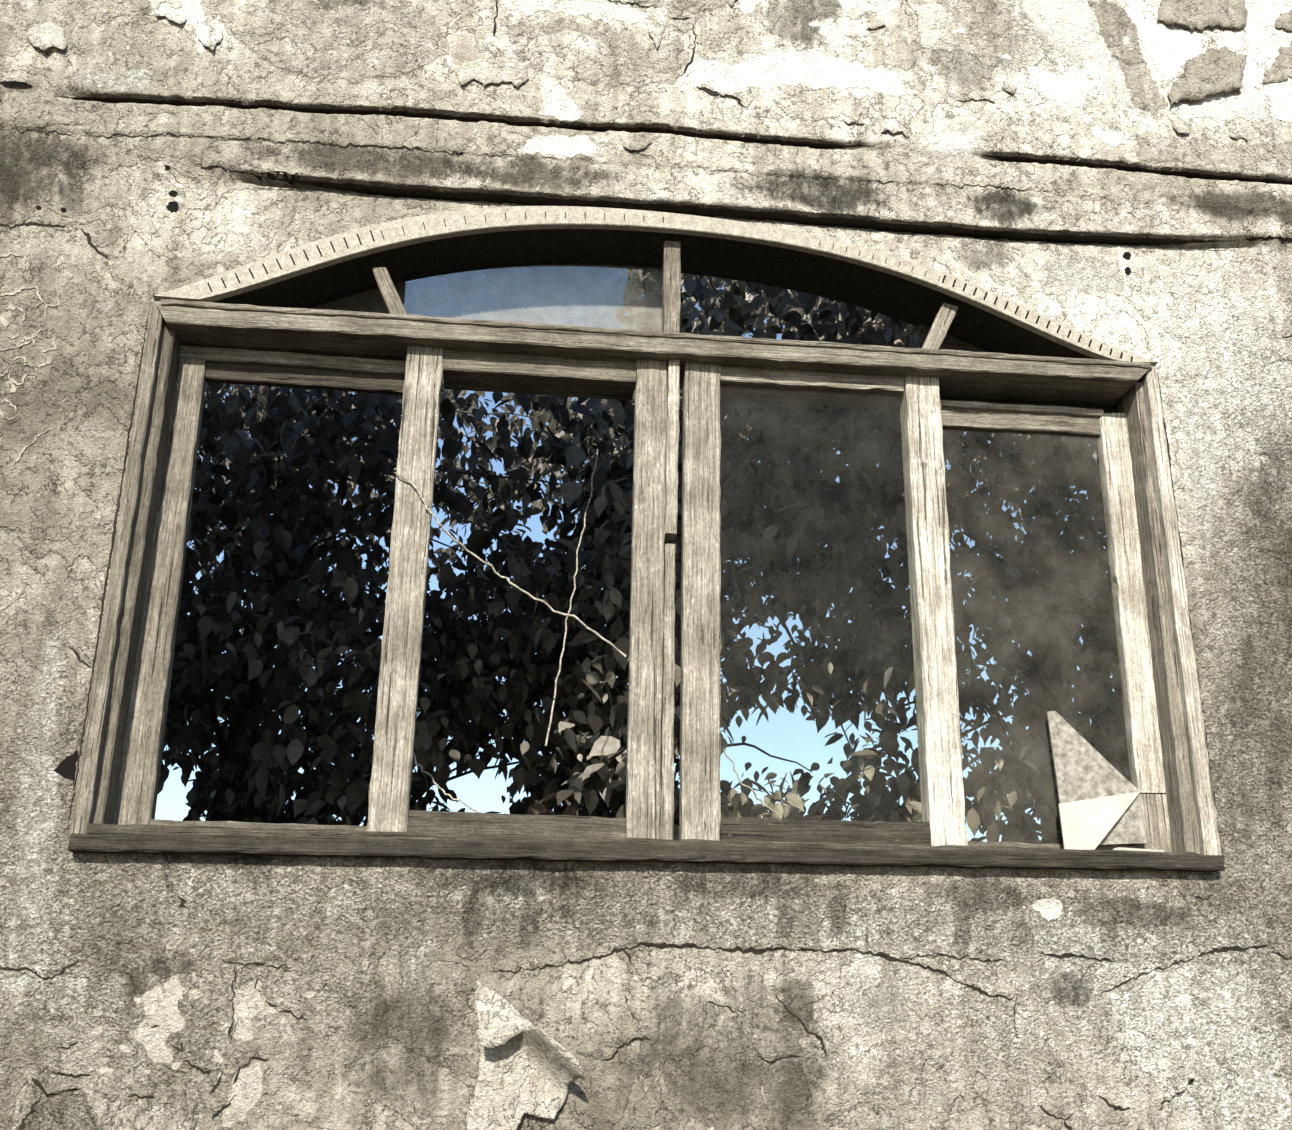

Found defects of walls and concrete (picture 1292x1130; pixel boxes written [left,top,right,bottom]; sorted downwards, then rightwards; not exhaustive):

peeling [149,0,223,51]
crack [0,0,1292,246]
spalling [687,0,913,105]
spalling [1001,0,1292,148]
crack [1040,944,1292,996]
peeling [28,1086,197,1130]
spalling [90,974,204,1076]
spalling [211,979,386,1130]
peeling [455,981,584,1130]